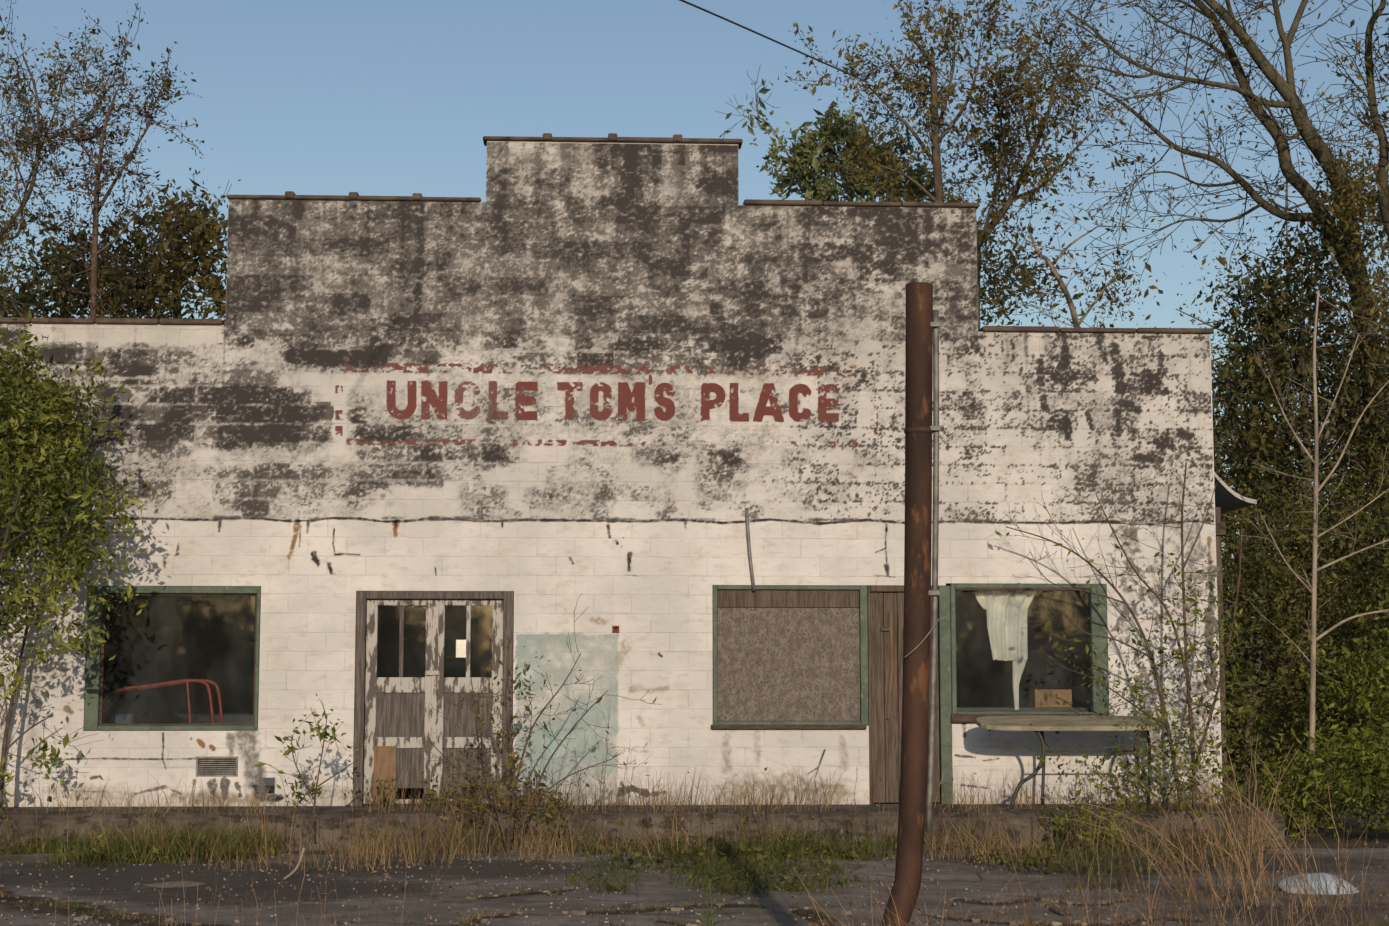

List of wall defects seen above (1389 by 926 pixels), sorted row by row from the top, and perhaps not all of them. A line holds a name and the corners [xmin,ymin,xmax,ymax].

leakage [227,142,977,432]
leakage [60,419,345,519]
leakage [1016,442,1147,522]
corrosion [288,519,301,558]